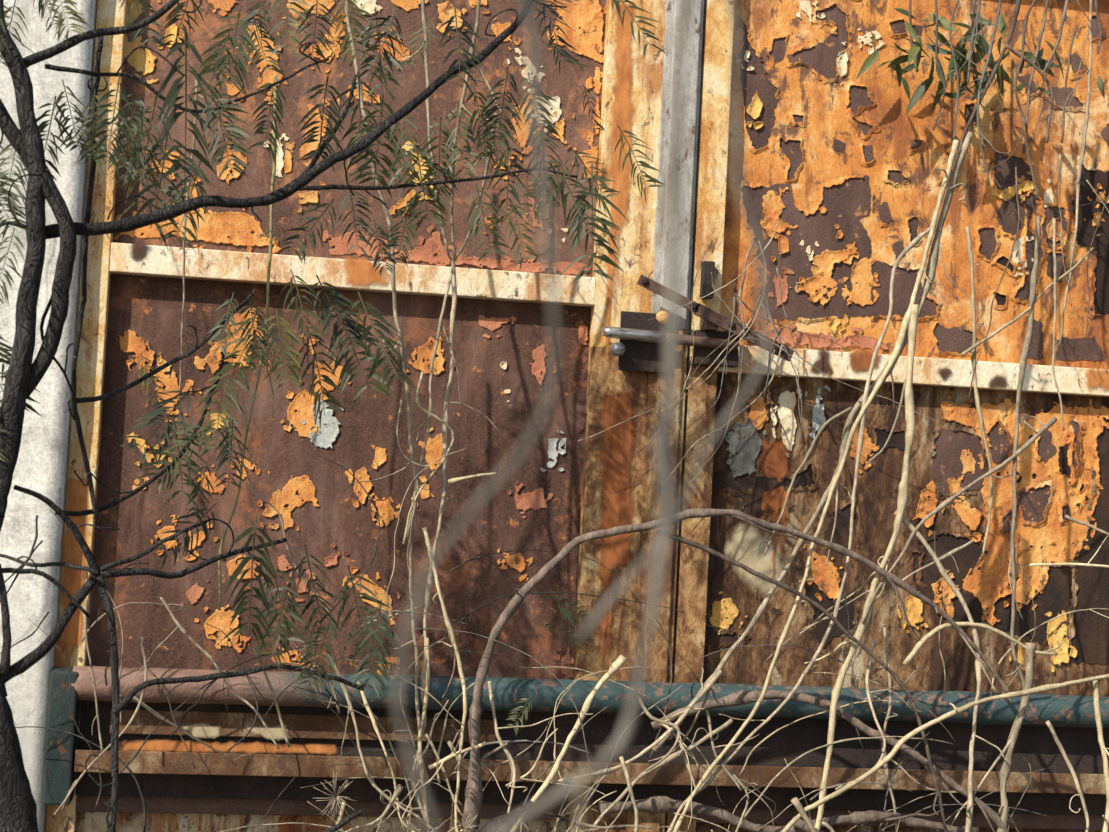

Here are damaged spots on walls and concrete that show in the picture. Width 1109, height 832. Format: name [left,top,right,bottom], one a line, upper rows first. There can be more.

peeling [114,150,281,254]
peeling [264,0,607,180]
rust [605,4,634,353]
peeling [736,0,982,357]
peeling [973,149,1109,361]
rust [54,478,87,668]
peeling [119,308,263,422]
peeling [280,334,351,449]
peeling [345,427,443,527]
peeling [712,385,831,518]
peeling [897,395,1109,672]
rust [119,816,147,832]